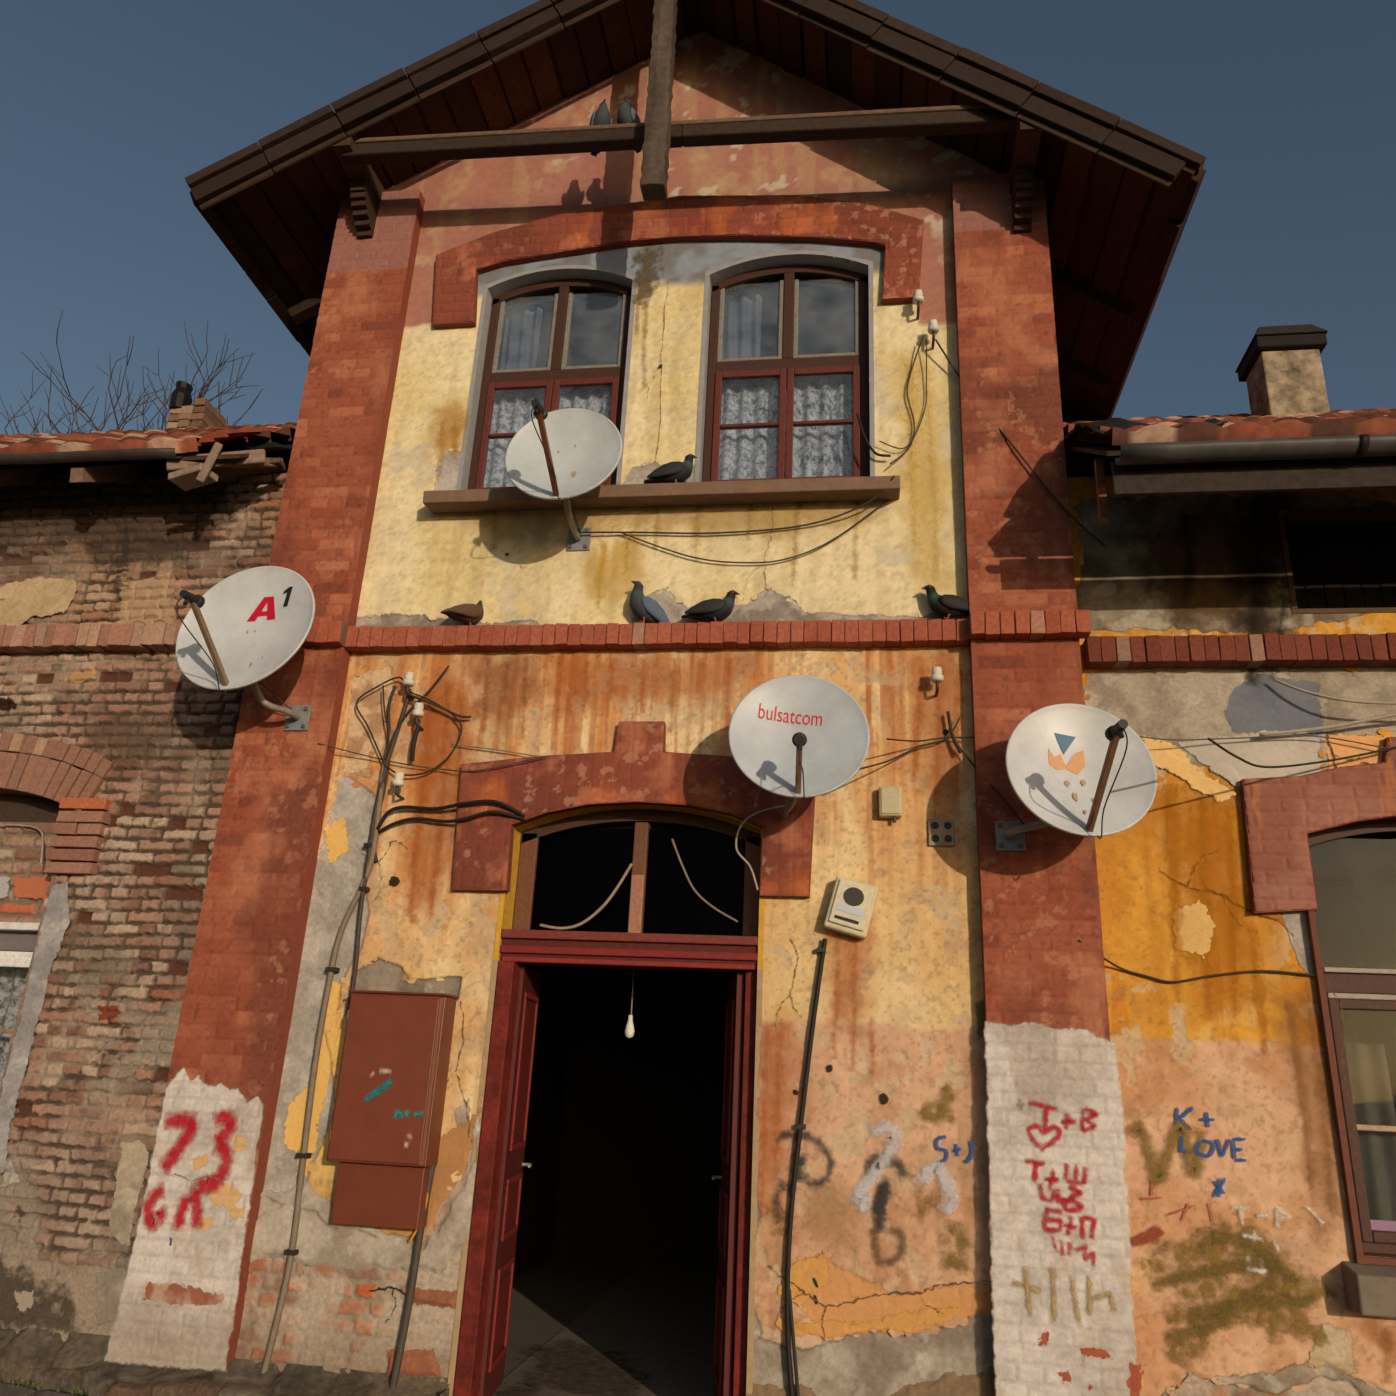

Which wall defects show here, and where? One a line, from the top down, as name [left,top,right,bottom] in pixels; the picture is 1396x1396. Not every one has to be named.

crack [647,281,668,462]
water stain [1230,492,1291,635]
flaking render [356,613,539,628]
flaking render [647,584,968,624]
spalling [0,698,18,710]
peeling [1172,900,1216,959]
peeling [1281,912,1315,978]
spalling [98,1005,121,1021]
flaking render [235,665,483,1393]
peeling [746,1250,997,1396]
flaking render [1162,1323,1395,1396]